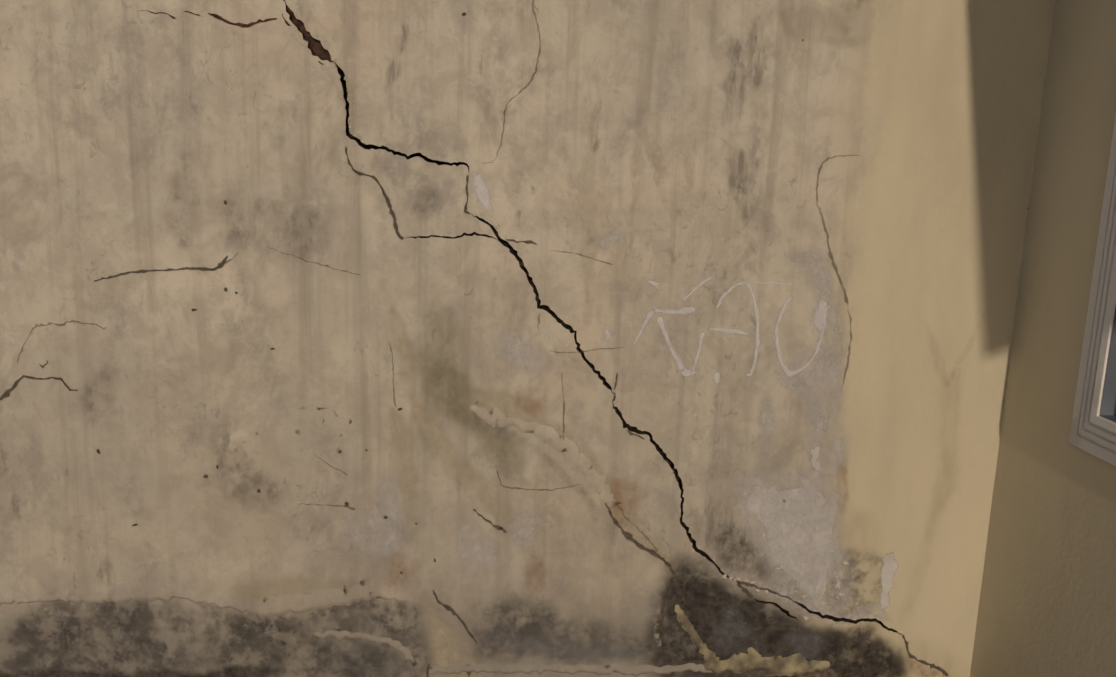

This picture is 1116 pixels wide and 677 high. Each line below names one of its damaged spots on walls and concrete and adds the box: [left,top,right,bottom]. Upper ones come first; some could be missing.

crack [94,255,236,282]
crack [0,321,105,400]
crack [140,0,948,677]
leakage [0,604,364,677]
leakage [482,564,903,677]
peeling [743,475,858,622]
peeling [878,552,898,618]